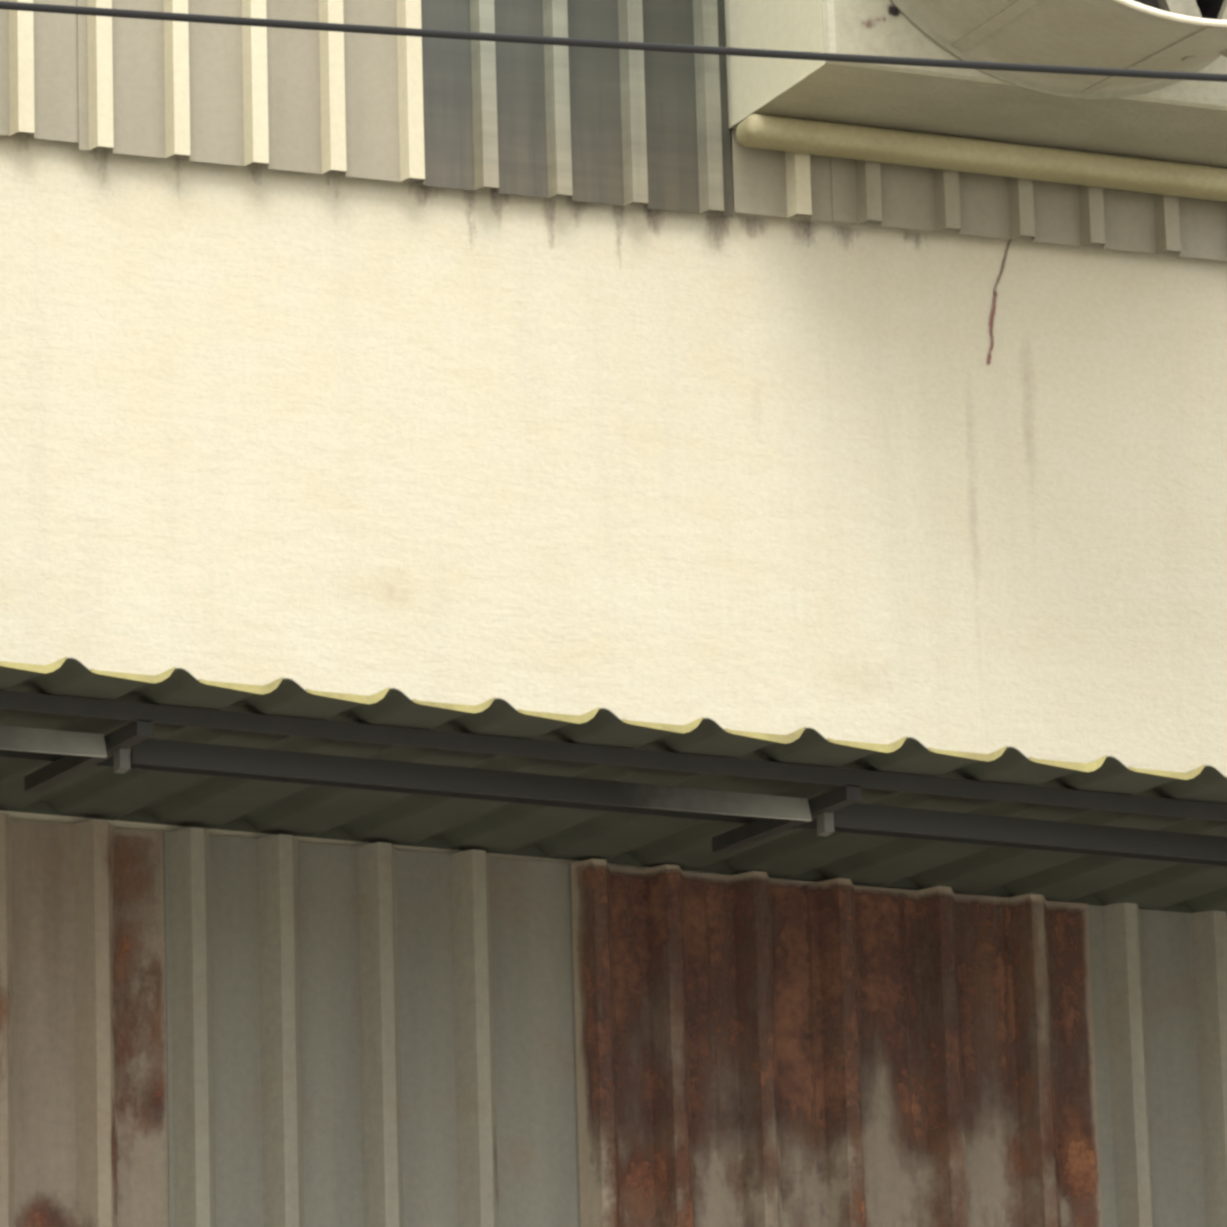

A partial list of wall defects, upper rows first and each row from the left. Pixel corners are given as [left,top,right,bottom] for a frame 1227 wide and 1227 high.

corrosion [987,239,1011,365]
corrosion [114,919,137,1068]
corrosion [141,1070,164,1122]
corrosion [580,866,1098,1227]
corrosion [25,1200,68,1227]